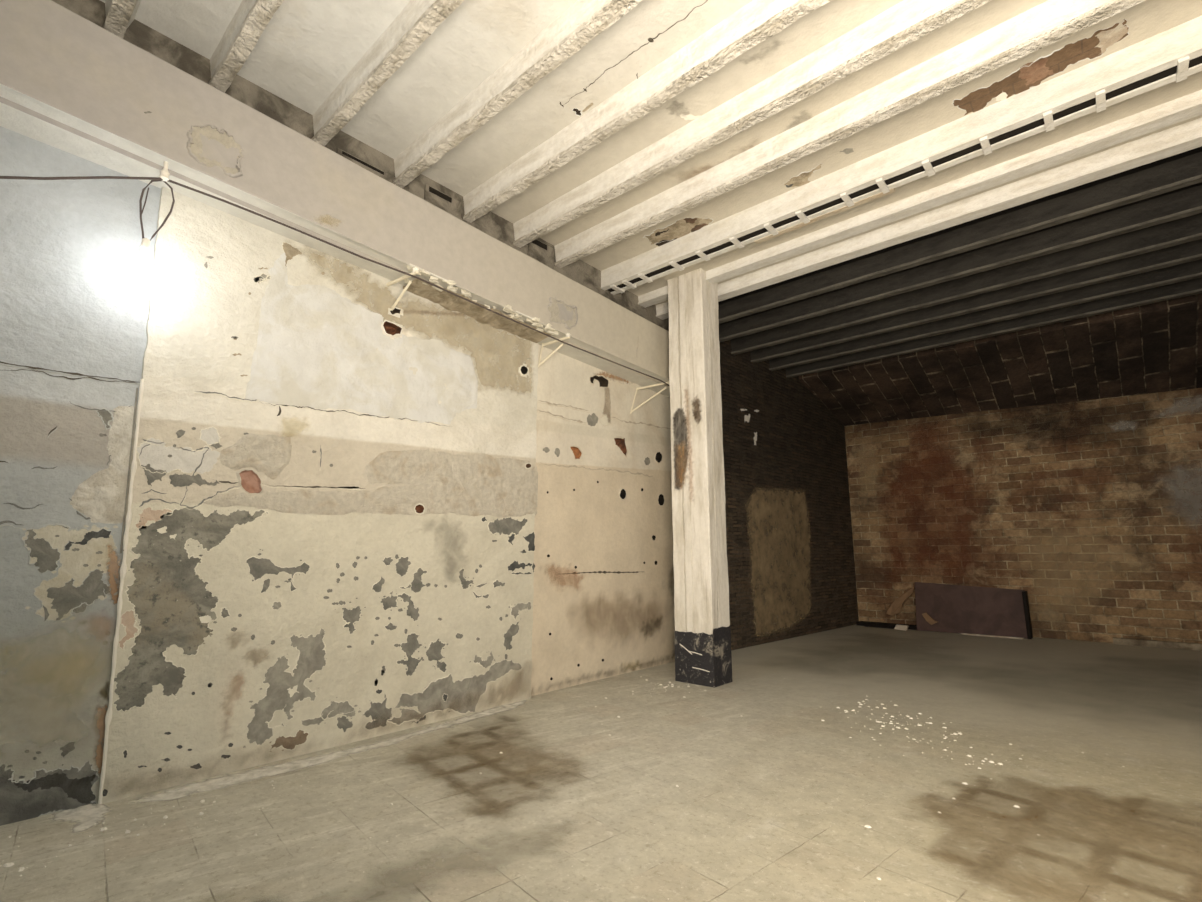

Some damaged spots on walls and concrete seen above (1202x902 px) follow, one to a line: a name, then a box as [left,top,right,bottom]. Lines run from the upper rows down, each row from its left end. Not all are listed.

crack [560,0,708,107]
flaking render [952,19,1129,116]
peeling [643,217,714,246]
spalling [403,265,558,343]
crack [0,361,140,412]
crack [3,498,91,529]
crack [107,439,239,510]
peeling [133,426,222,487]
rust [677,445,685,487]
peeling [0,507,269,713]
peeling [221,514,535,759]
peeling [0,740,108,826]